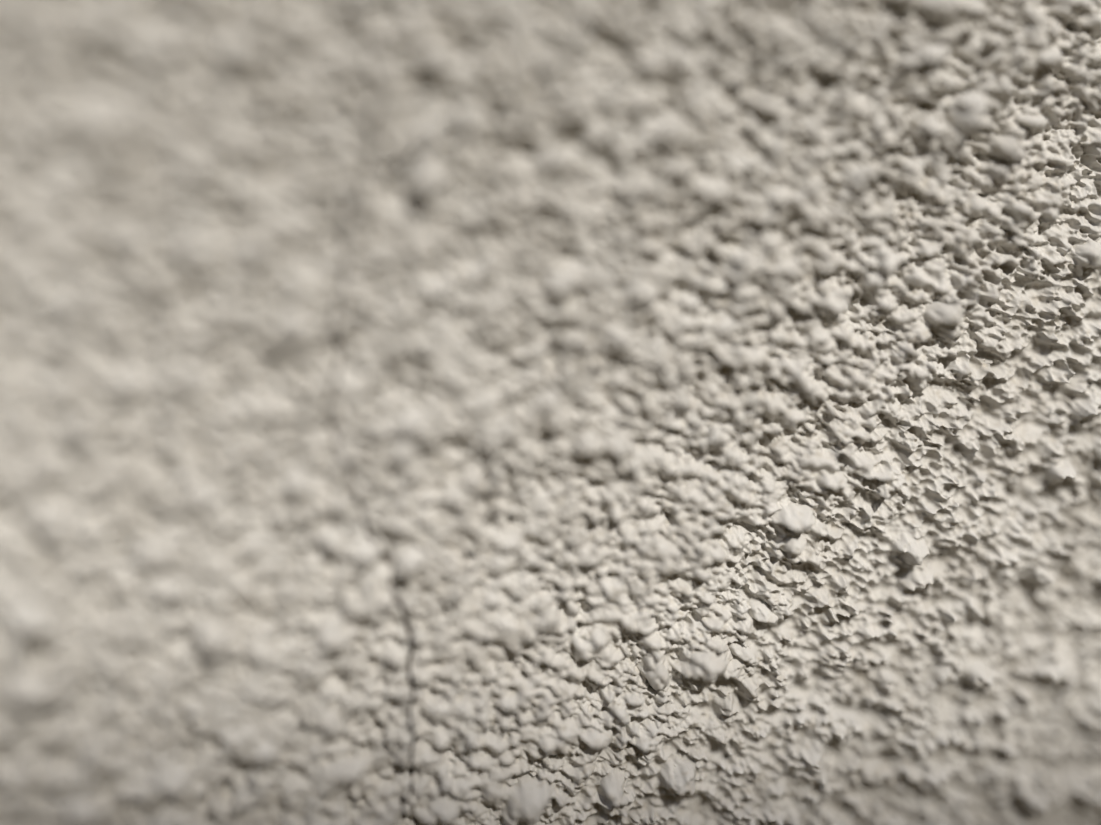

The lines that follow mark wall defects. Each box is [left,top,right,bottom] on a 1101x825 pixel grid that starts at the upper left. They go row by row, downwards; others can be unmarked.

crack [325,0,418,825]